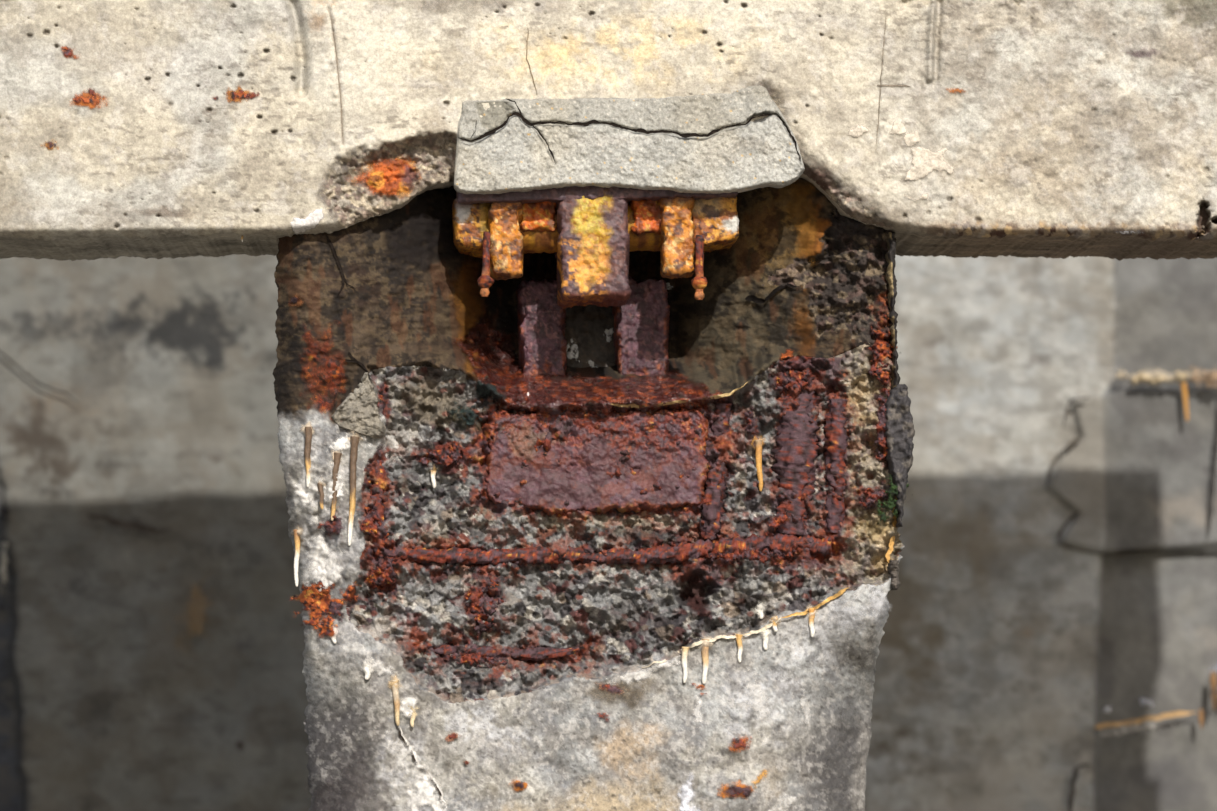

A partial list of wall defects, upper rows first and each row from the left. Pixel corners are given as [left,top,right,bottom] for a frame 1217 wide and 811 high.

rust [62,46,78,59]
rust [73,88,105,109]
rust [213,86,259,102]
crack [458,31,801,162]
spalling [291,133,457,233]
rust [358,158,421,195]
rust [454,317,722,415]
spalling [331,144,915,703]
crack [1046,397,1089,487]
rust [318,515,343,536]
rust [290,580,362,637]
rust [718,770,767,798]